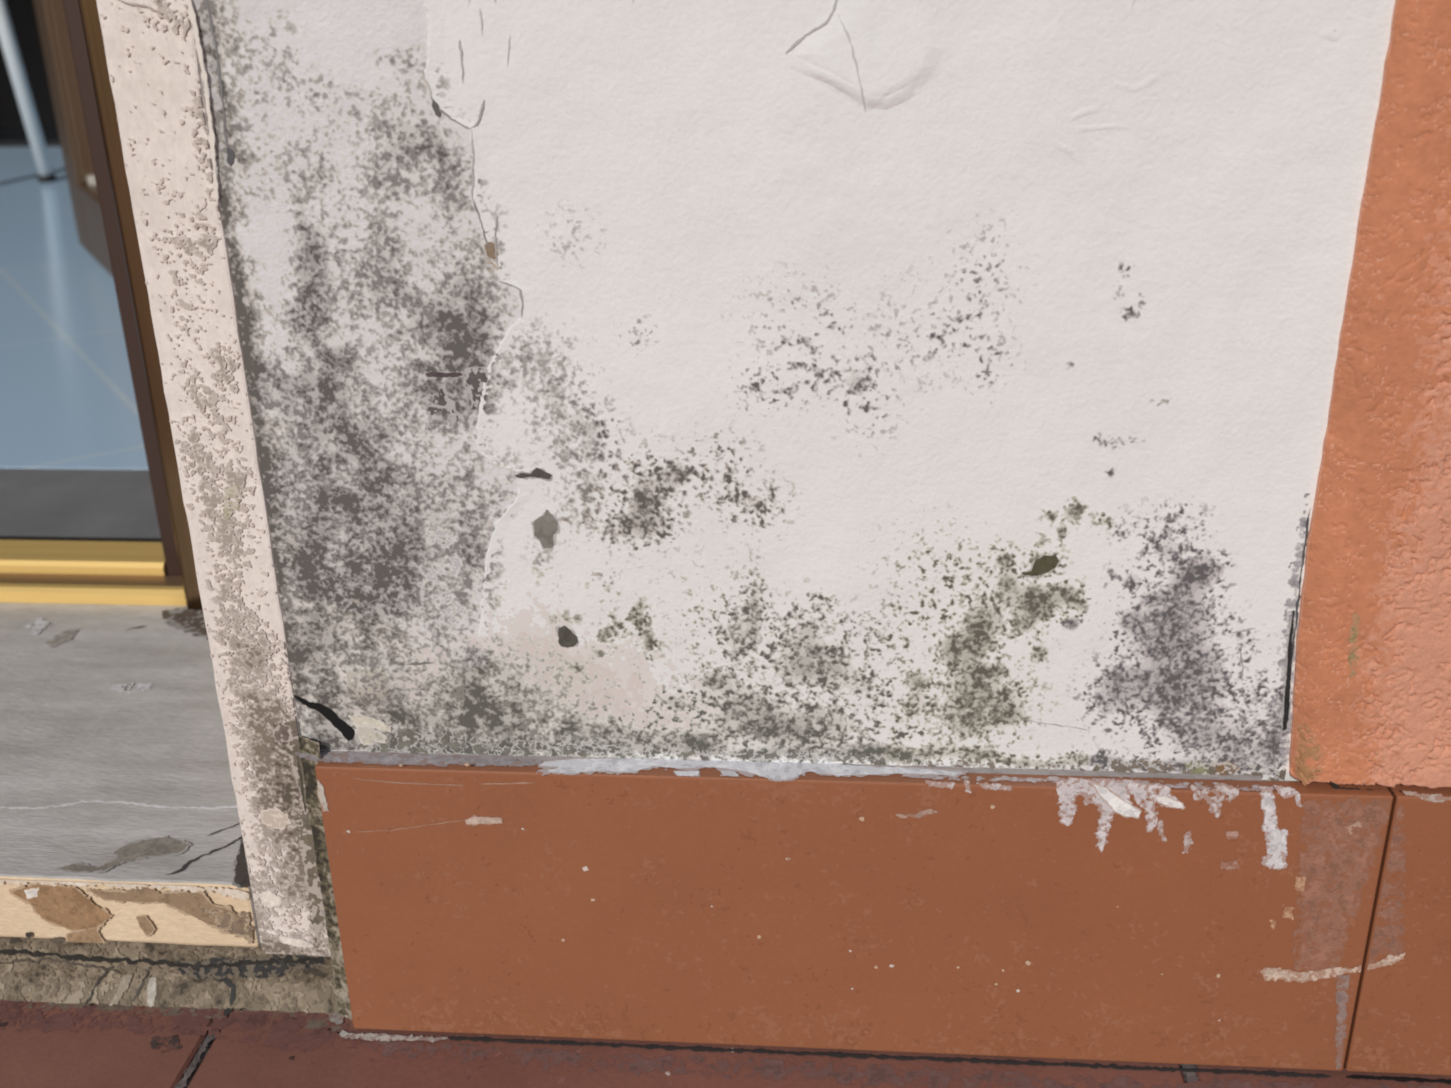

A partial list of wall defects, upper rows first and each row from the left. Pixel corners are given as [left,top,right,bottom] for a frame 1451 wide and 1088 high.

crack [786,0,865,109]
damp [536,198,607,269]
peeling [187,0,560,637]
damp [613,314,659,356]
mould [1113,261,1147,322]
mould [1092,431,1146,478]
damp [624,891,1185,1060]